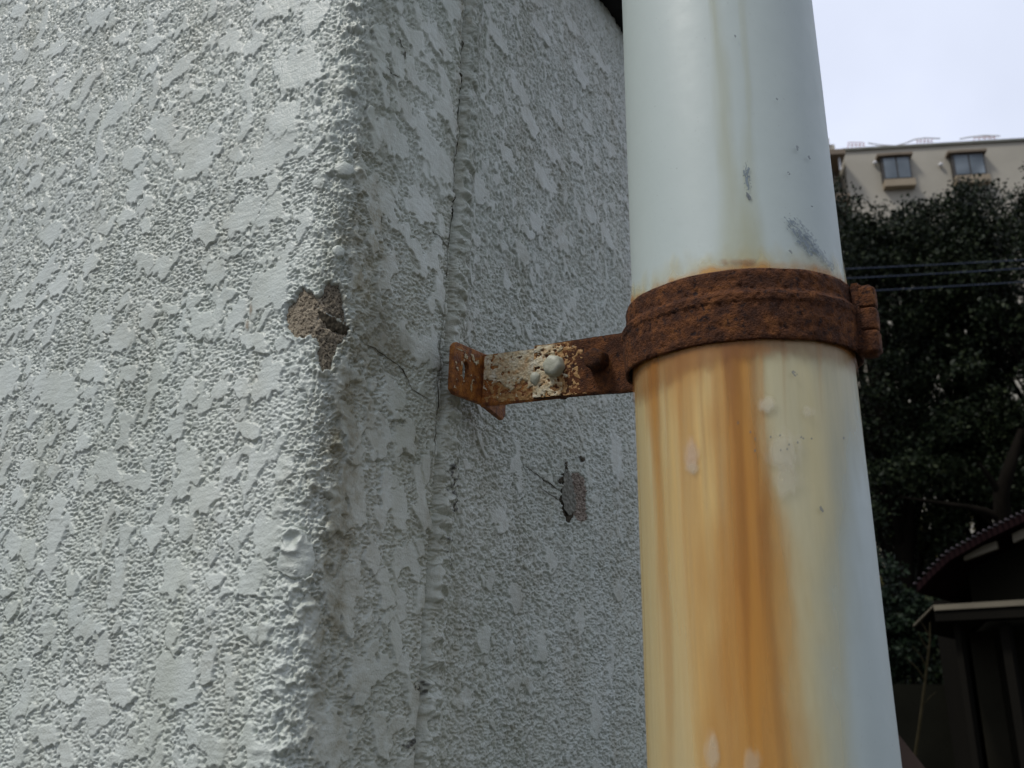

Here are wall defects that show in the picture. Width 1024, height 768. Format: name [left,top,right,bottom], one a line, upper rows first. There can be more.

spalling [286,283,350,372]
crack [357,41,464,474]
spalling [558,456,588,524]
corrosion [633,339,857,768]